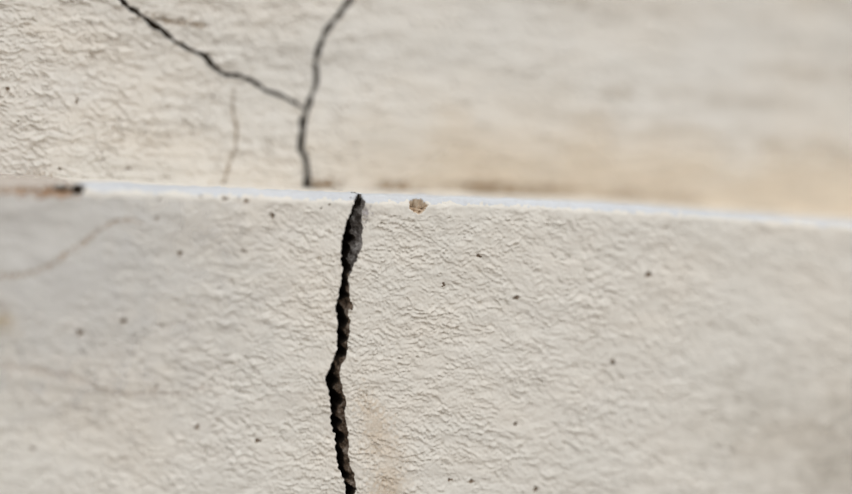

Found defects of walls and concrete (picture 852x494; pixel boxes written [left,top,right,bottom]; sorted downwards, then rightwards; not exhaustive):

crack [119,0,353,188]
crack [325,190,365,494]